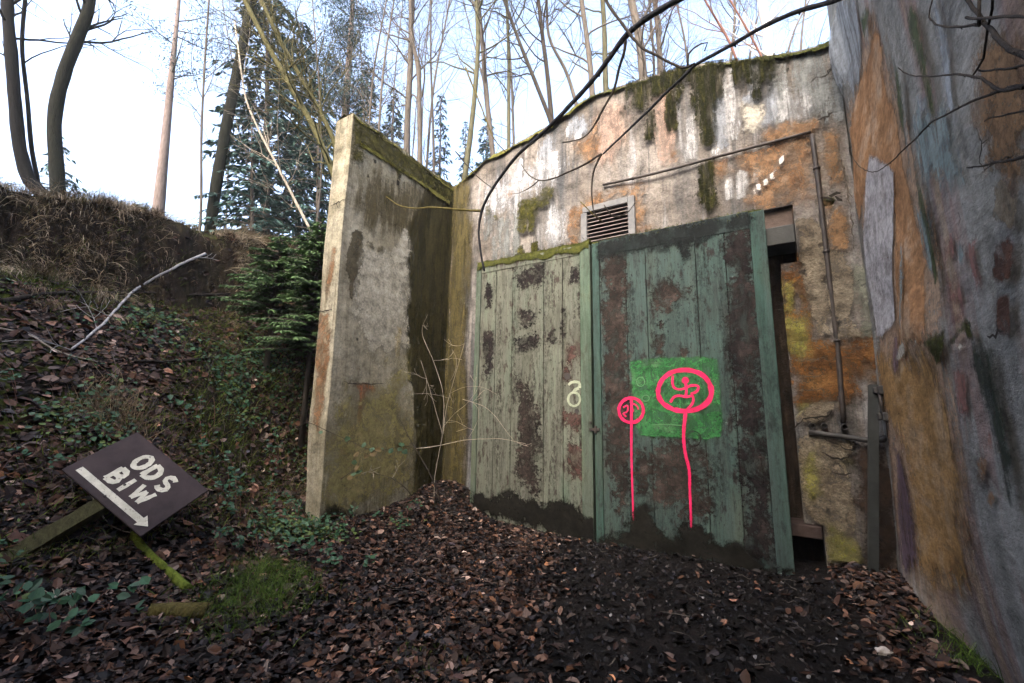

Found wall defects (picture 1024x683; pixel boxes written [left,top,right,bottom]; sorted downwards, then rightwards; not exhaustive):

damp [566,114,591,139]
damp [684,116,697,161]
damp [484,135,569,261]
damp [725,170,758,200]
damp [346,188,453,493]